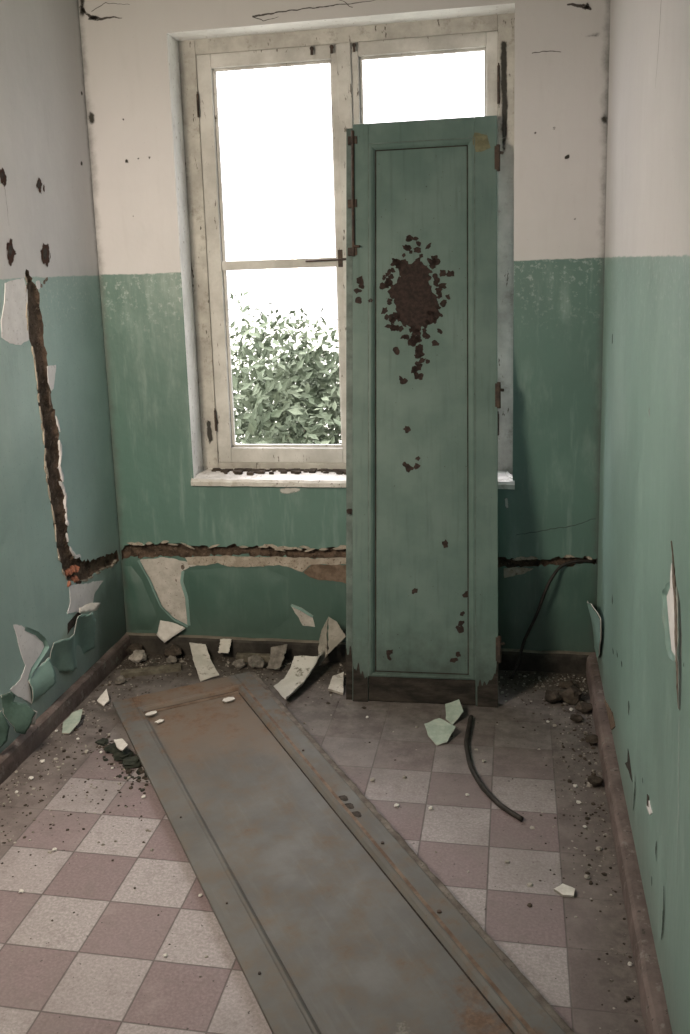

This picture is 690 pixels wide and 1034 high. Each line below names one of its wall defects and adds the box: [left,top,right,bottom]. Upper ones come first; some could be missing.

peeling [1,277,48,345]
peeling [47,365,56,405]
peeling [137,557,197,643]
peeling [291,604,315,627]
peeling [0,581,103,748]